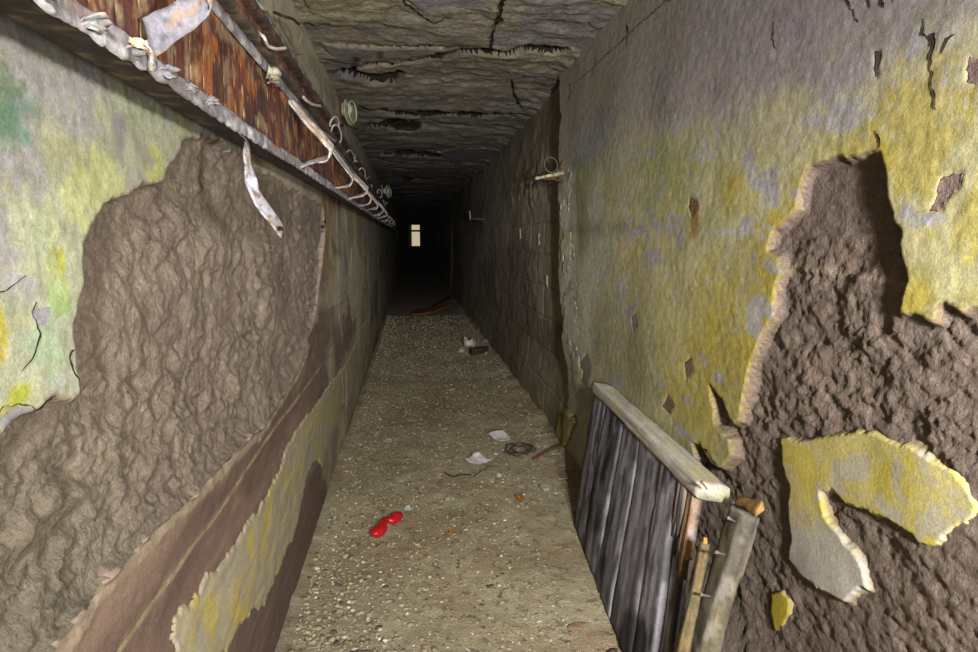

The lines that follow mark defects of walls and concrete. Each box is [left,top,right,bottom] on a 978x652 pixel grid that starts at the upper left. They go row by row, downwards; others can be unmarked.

crack [335,0,564,83]
crack [568,0,670,100]
crack [920,19,955,110]
peeling [966,56,978,85]
crack [360,82,522,186]
water stain [558,158,575,230]
spalling [0,134,350,652]
spalling [682,154,978,652]